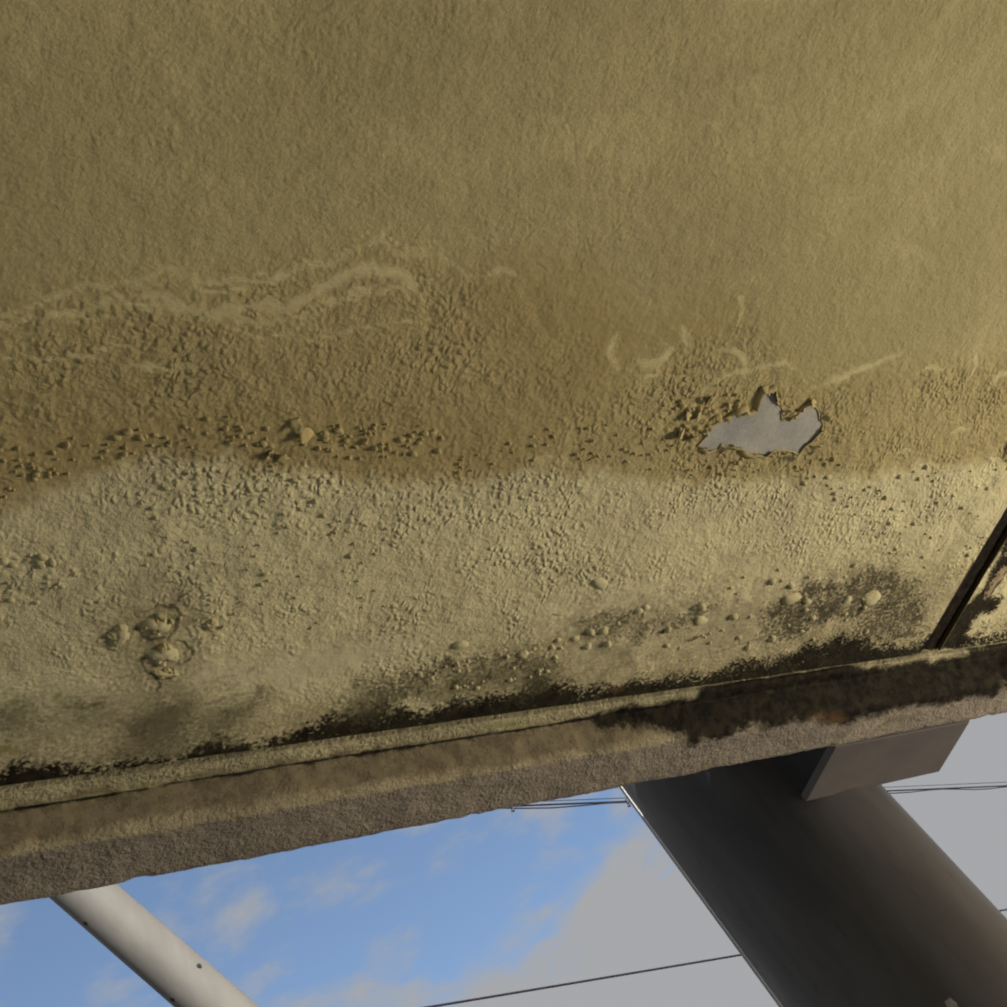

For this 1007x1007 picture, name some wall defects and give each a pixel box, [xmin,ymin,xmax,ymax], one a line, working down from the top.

peeling [679,385,832,464]
leakage [0,259,1007,787]
spalling [984,566,1007,598]
leakage [0,788,149,813]